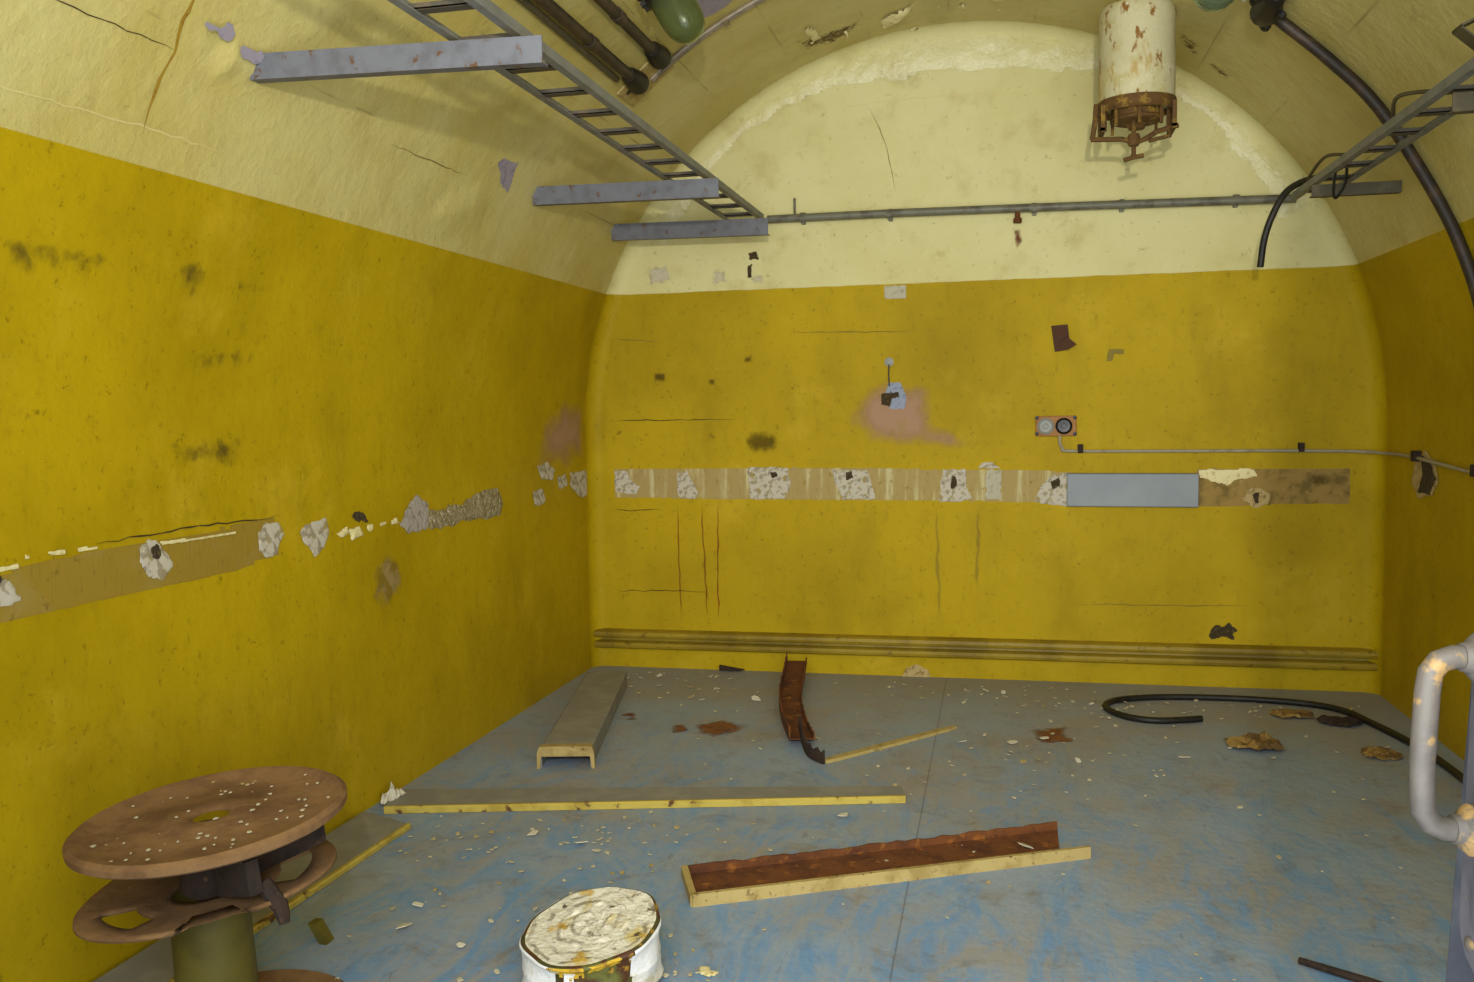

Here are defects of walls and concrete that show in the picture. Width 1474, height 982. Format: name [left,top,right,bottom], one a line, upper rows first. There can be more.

crack [57,0,174,50]
flaking render [881,382,907,409]
flaking render [614,471,639,494]
flaking render [677,471,698,499]
flaking render [747,467,790,500]
flaking render [831,469,875,500]
flaking render [939,462,1002,502]
flaking render [1035,473,1067,506]
flaking render [258,488,503,558]
peeling [48,546,98,555]
flaking render [139,531,236,581]
flaking render [0,555,29,607]